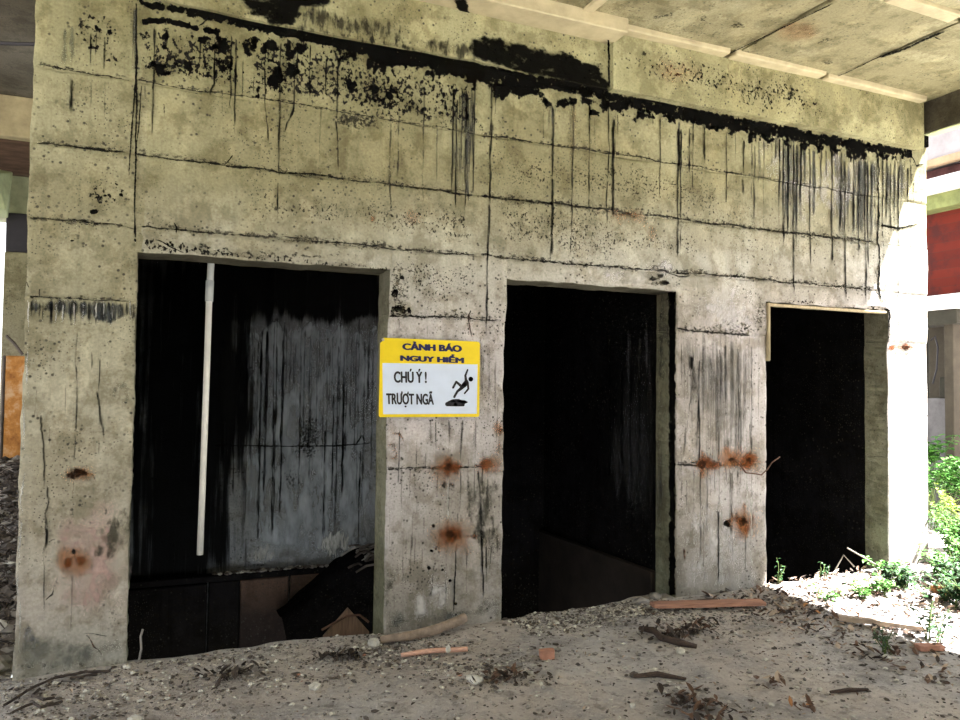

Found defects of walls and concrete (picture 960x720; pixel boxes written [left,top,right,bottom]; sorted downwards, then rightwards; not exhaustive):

water stain [139,0,914,294]
crack [27,4,917,338]
water stain [717,345,752,453]
water stain [31,261,379,589]
rust [67,469,95,479]
rust [440,461,459,474]
rust [697,449,757,474]
rust [723,508,753,535]
rust [439,525,476,546]
rust [60,549,87,570]